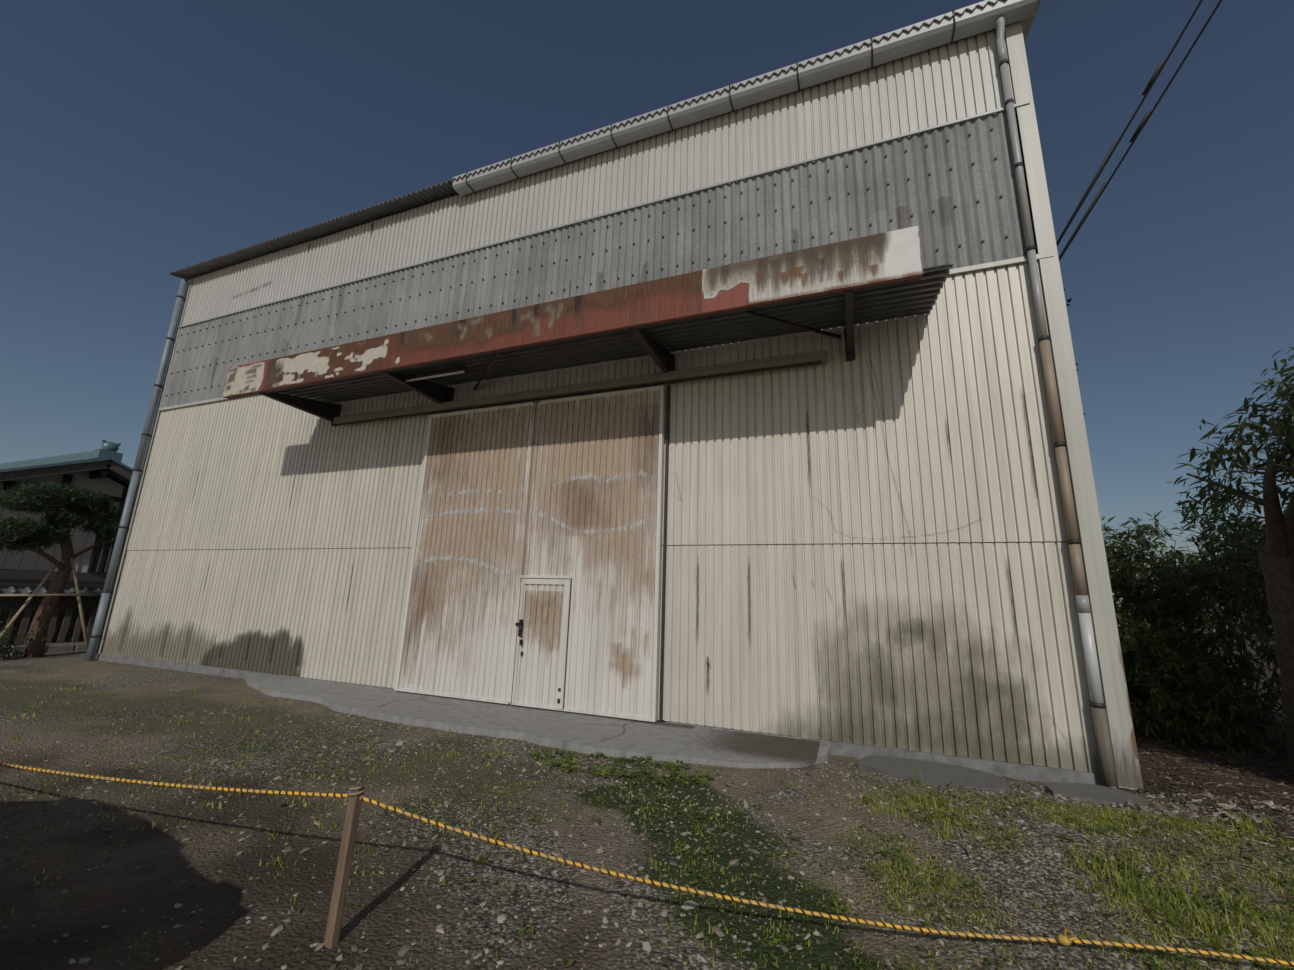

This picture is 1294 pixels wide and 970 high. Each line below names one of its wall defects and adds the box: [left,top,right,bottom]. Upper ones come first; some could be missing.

peeling [702,226,925,305]
peeling [223,339,400,397]
rust [266,270,702,389]